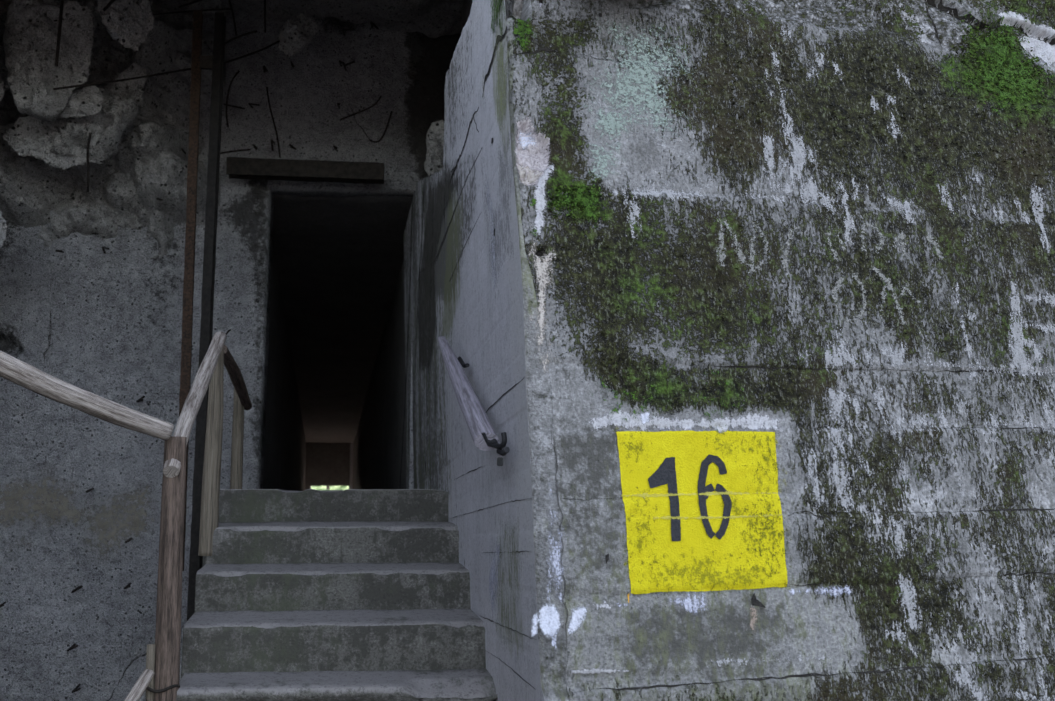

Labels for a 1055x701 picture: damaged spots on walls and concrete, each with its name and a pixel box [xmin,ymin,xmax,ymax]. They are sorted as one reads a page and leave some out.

spalling [55,0,64,67]
crack [925,0,1055,47]
leakage [998,11,1055,67]
leakage [732,26,868,245]
leakage [608,181,705,238]
leakage [937,175,1052,253]
leakage [798,327,908,371]
leakage [922,281,1055,382]
leakage [589,410,779,433]
leakage [801,387,949,512]
leakage [531,533,625,648]
leakage [885,573,923,657]